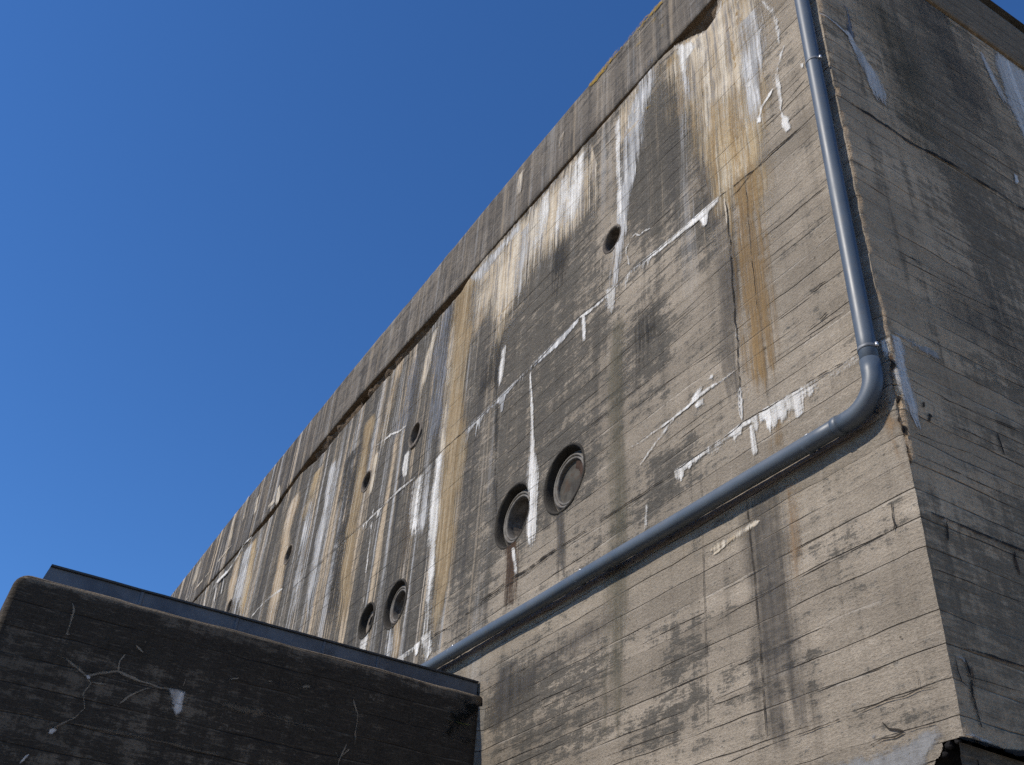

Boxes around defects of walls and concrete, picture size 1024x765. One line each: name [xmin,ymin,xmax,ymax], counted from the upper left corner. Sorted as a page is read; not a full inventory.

efflorescence [676,42,695,99]
efflorescence [741,2,790,132]
efflorescence [972,44,1024,137]
rust [667,0,774,386]
damp [293,447,360,621]
damp [363,307,453,661]
rust [420,328,438,391]
rust [431,265,485,631]
crack [251,121,856,641]
damp [466,69,722,545]
damp [675,380,816,480]
crack [48,655,220,756]